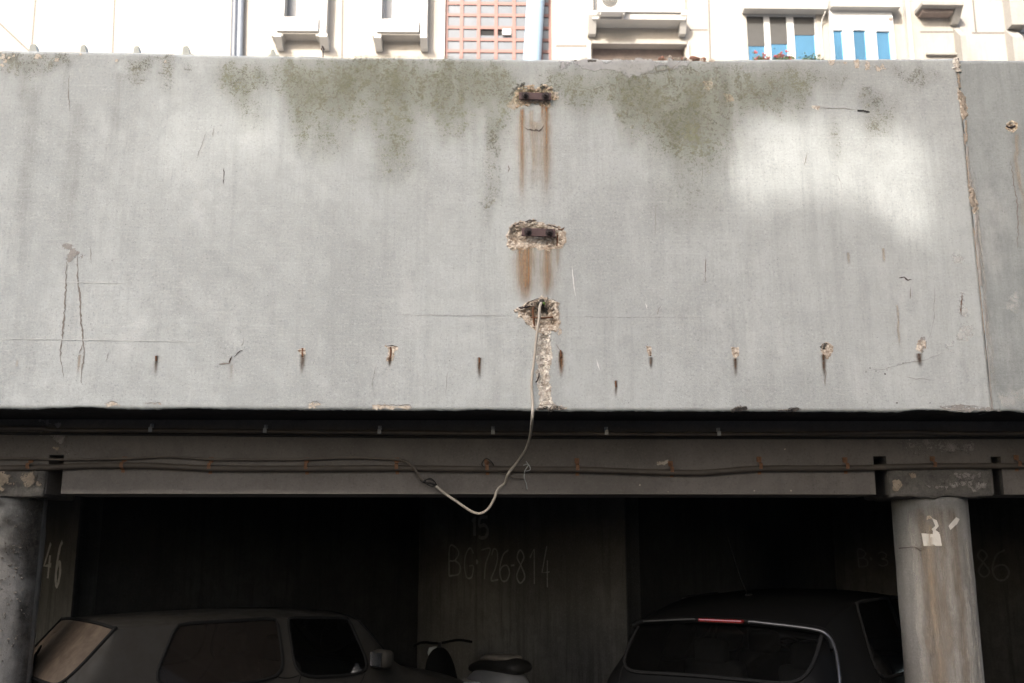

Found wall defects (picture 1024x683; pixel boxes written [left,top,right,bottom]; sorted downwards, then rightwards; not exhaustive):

spalling [506,83,559,109]
spalling [506,219,566,252]
corrosion [519,248,530,291]
crack [4,248,149,383]
spalling [513,295,567,412]
peeling [0,471,42,491]